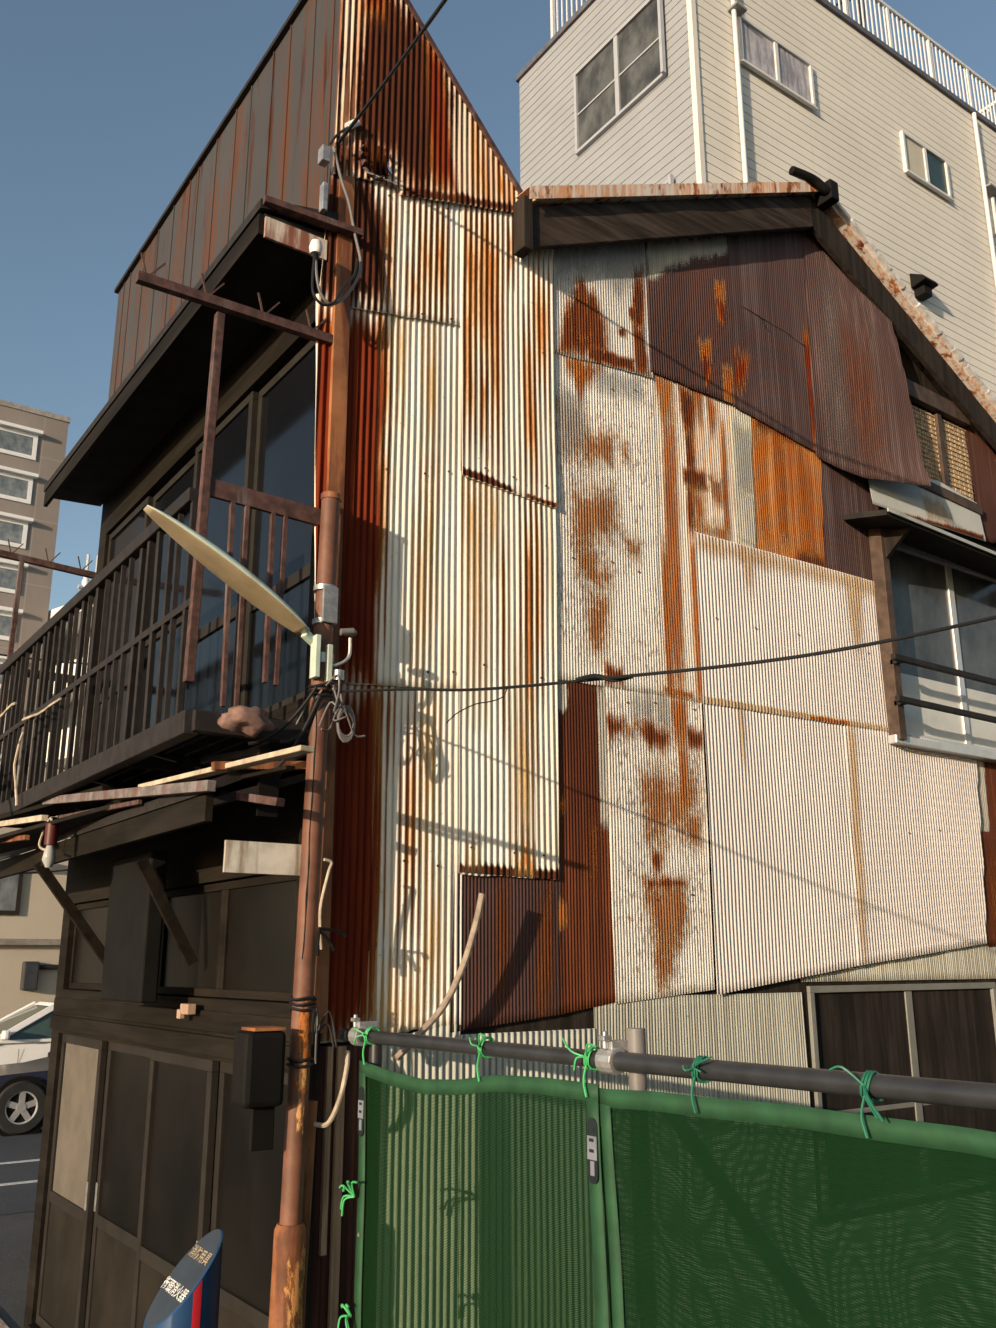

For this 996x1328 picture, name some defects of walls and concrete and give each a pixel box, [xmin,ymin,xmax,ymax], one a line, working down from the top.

rust [316,0,889,1042]